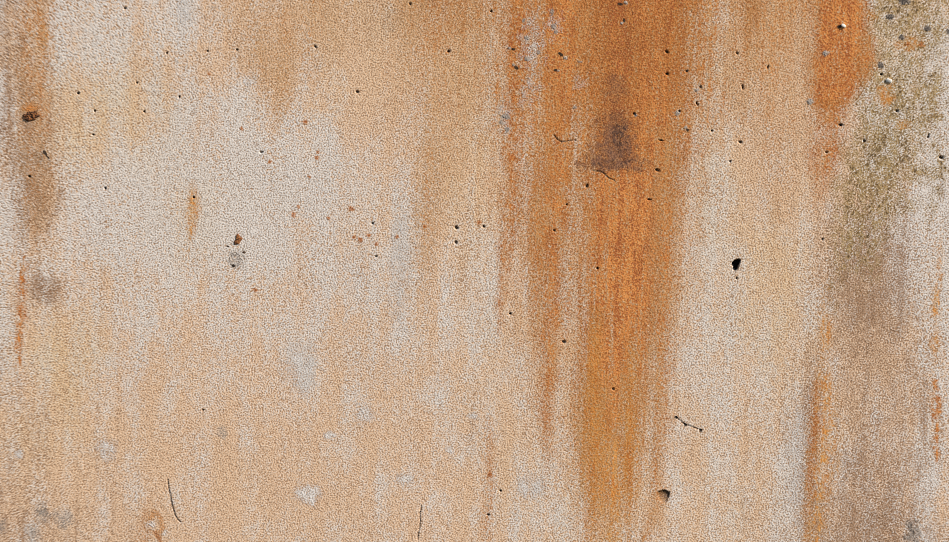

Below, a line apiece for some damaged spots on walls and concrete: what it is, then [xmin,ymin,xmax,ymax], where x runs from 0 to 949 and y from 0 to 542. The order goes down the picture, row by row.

corrosion [23,105,41,122]
corrosion [810,0,876,187]
corrosion [473,0,725,542]